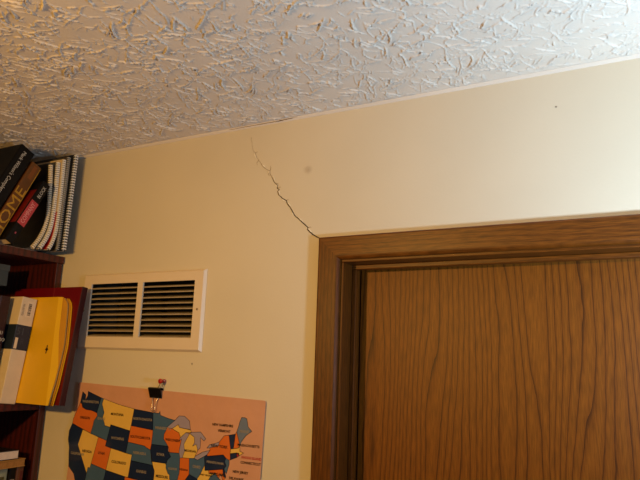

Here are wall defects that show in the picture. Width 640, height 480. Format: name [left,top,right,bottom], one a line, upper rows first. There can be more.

crack [231,117,319,238]